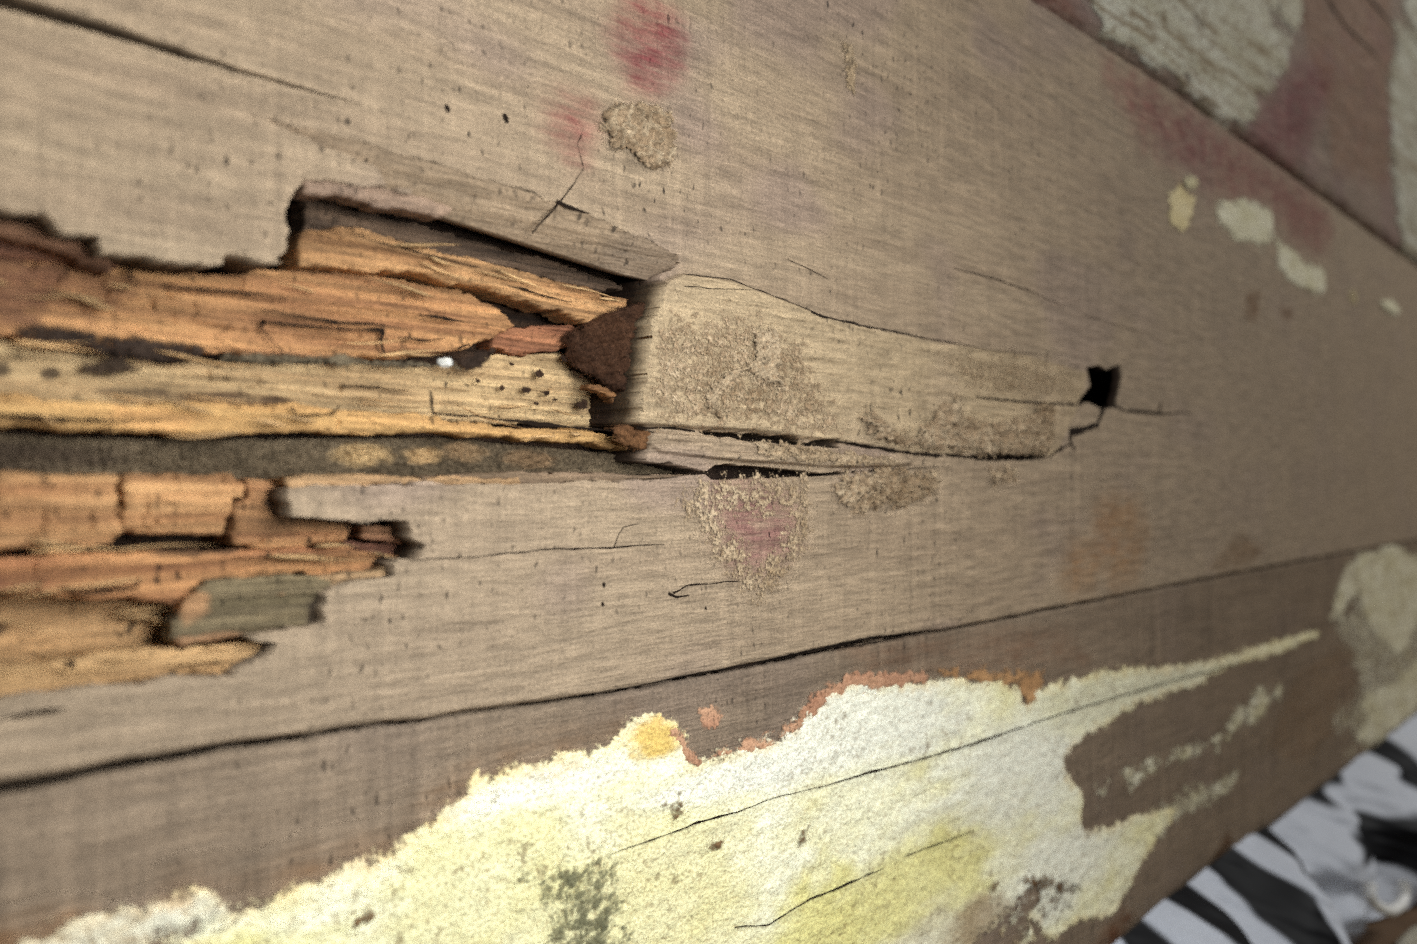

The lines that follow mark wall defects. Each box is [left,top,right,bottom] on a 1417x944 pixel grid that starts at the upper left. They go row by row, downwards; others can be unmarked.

spalling [0,119,694,695]
crack [636,396,1193,479]
crack [610,661,1247,855]
crack [735,831,973,928]